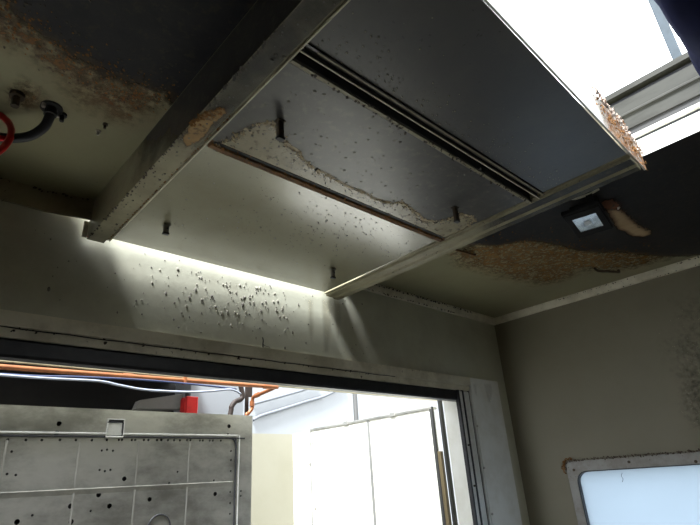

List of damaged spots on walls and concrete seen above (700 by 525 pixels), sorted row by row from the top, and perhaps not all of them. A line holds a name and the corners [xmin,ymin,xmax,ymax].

rust [592,87,647,170]
peeling [601,198,652,237]